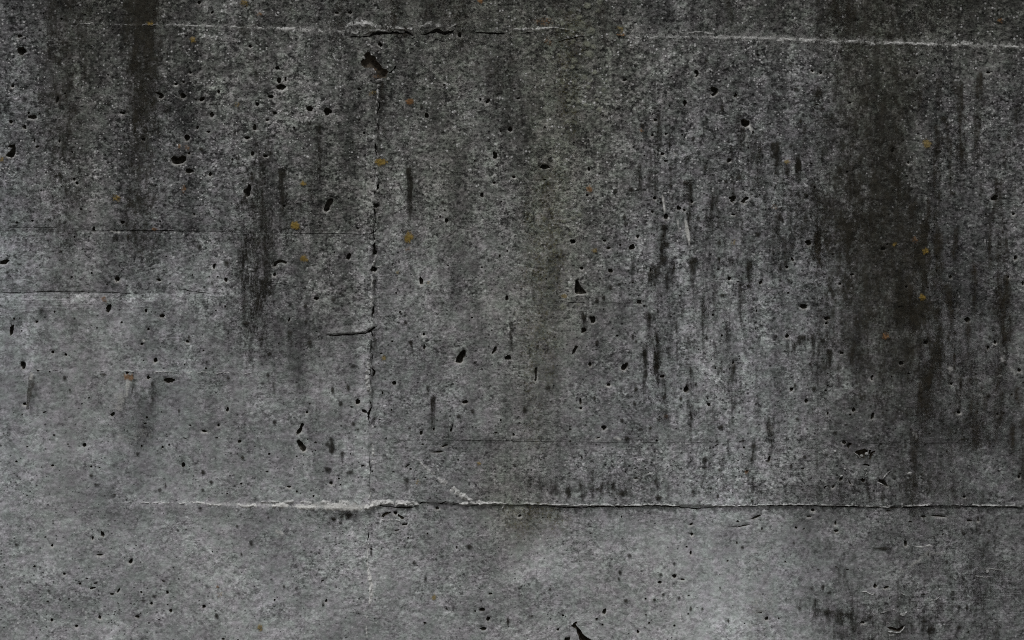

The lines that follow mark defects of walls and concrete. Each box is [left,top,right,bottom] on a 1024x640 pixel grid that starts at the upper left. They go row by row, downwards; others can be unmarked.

leakage [234,142,312,348]
leakage [713,0,1024,480]
leakage [642,308,669,389]